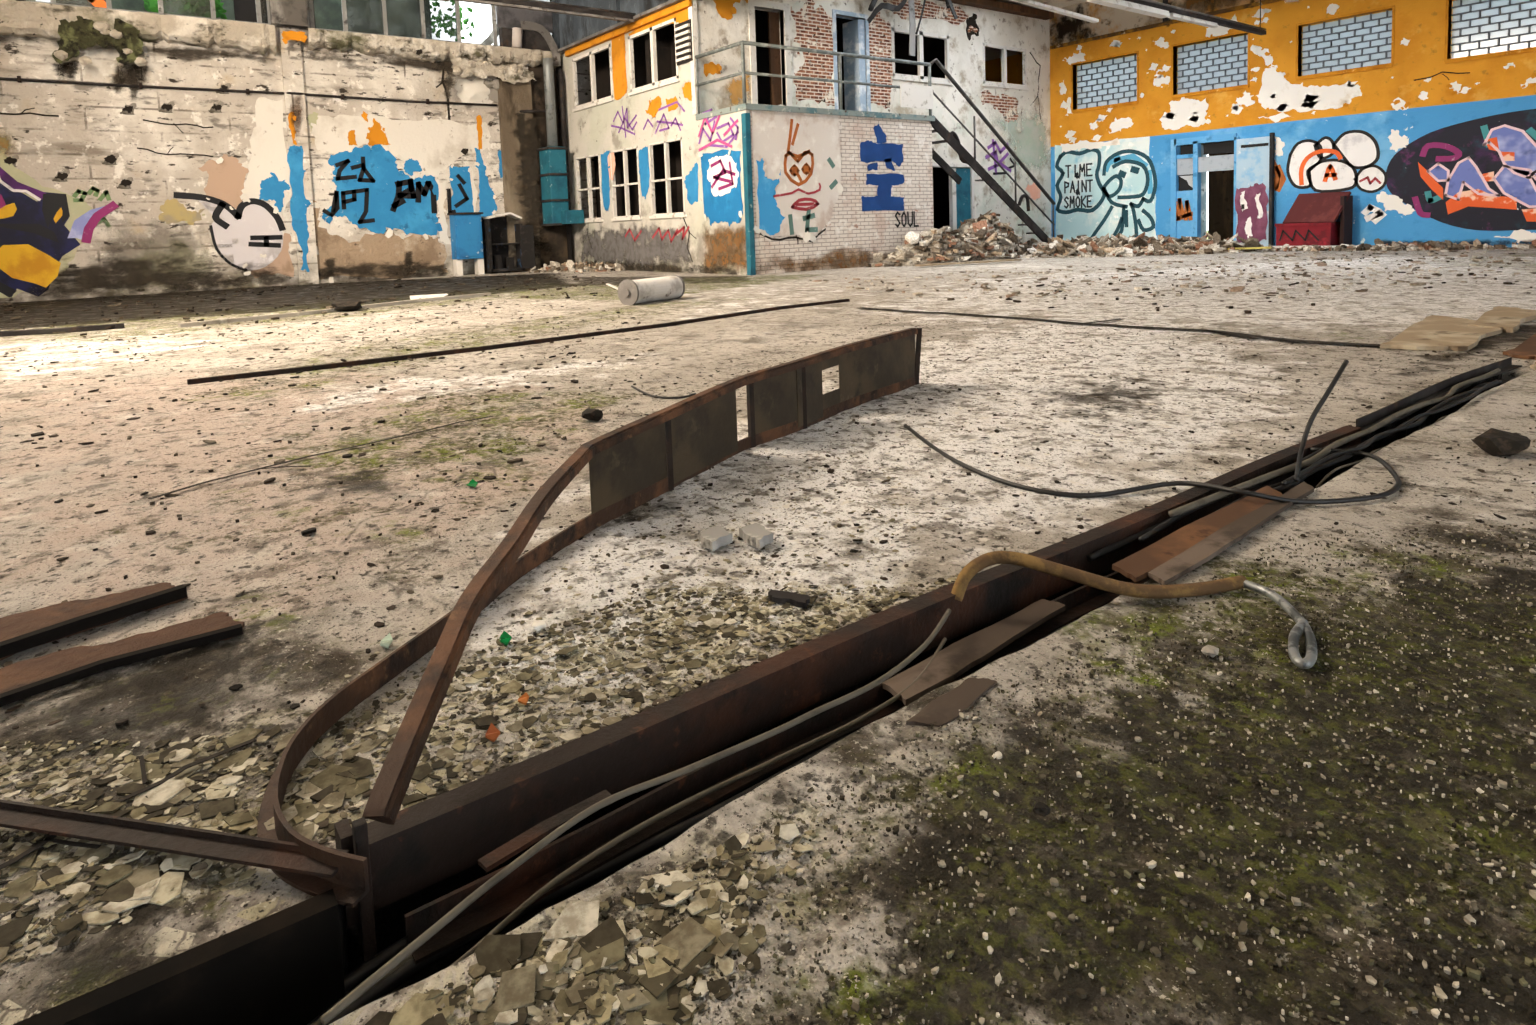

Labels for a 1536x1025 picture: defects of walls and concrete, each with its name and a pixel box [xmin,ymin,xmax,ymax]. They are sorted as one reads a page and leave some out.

peeling [1307,3,1340,15]
water stain [53,44,78,79]
flaking render [684,0,843,242]
flaking render [869,0,979,109]
flaking render [978,90,1021,123]
peeling [1059,45,1134,152]
peeling [1110,9,1362,156]
peeling [1388,78,1480,152]
peeling [1503,62,1536,89]